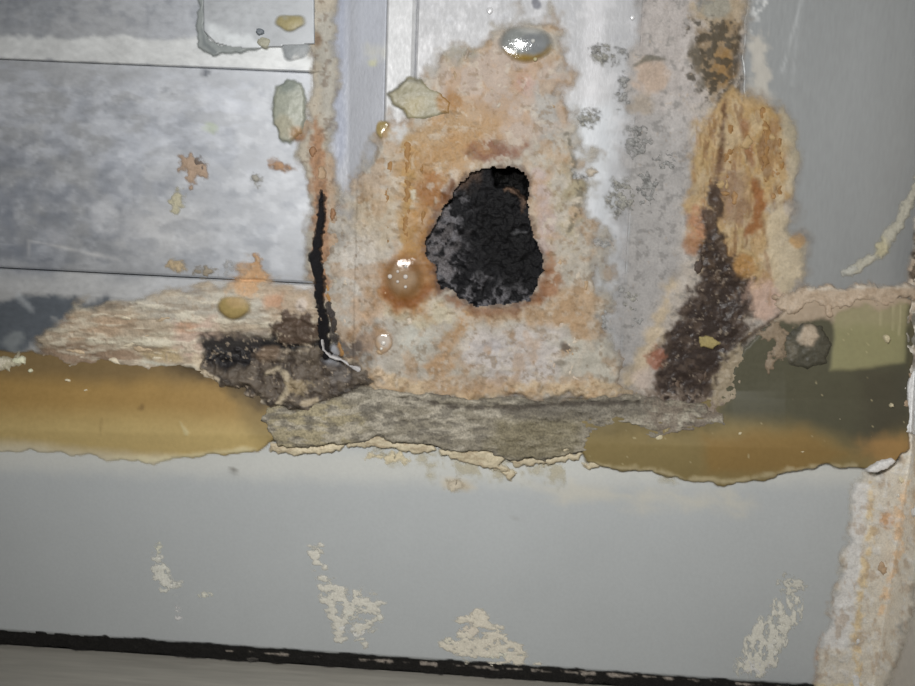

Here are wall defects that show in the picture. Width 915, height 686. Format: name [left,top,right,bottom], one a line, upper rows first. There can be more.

water stain [591,45,628,64]
water stain [616,76,632,104]
water stain [577,108,600,128]
water stain [626,126,675,169]
corrosion [36,0,809,414]
water stain [605,171,658,219]
crack [308,190,361,372]
peeling [904,370,915,435]
spalling [261,387,725,481]
peeling [866,458,896,472]